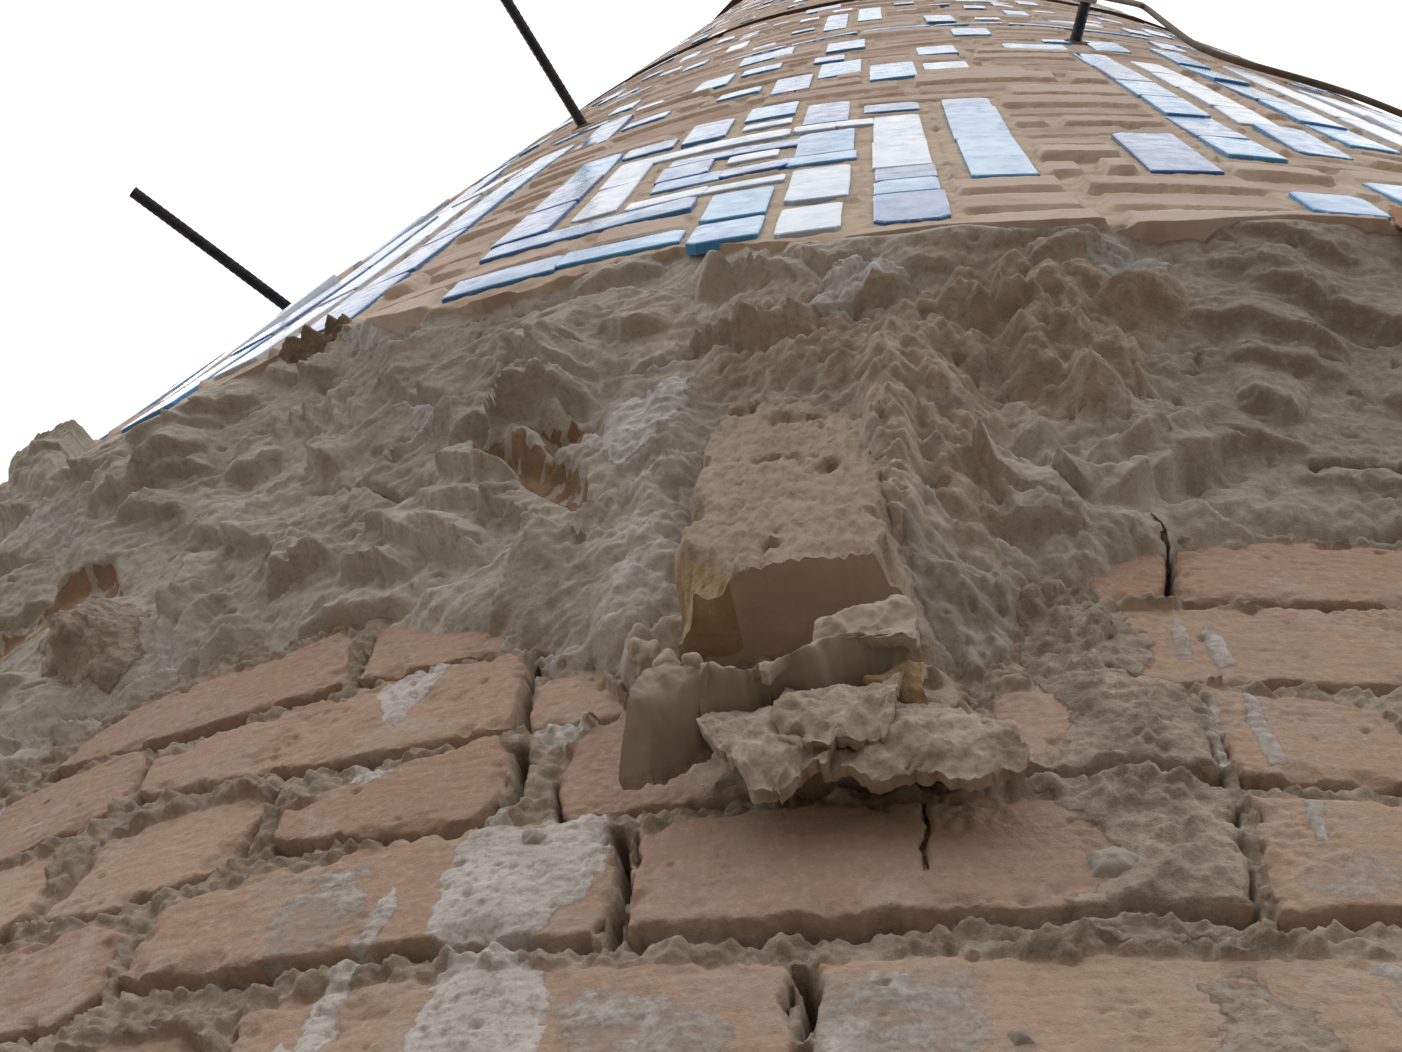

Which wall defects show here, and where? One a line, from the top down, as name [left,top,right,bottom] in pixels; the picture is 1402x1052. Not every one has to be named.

spalling [278,313,352,363]
spalling [472,420,599,511]
crack [1151,513,1171,597]
spalling [0,565,123,660]
peeling [619,594,1030,805]
crack [919,805,930,869]